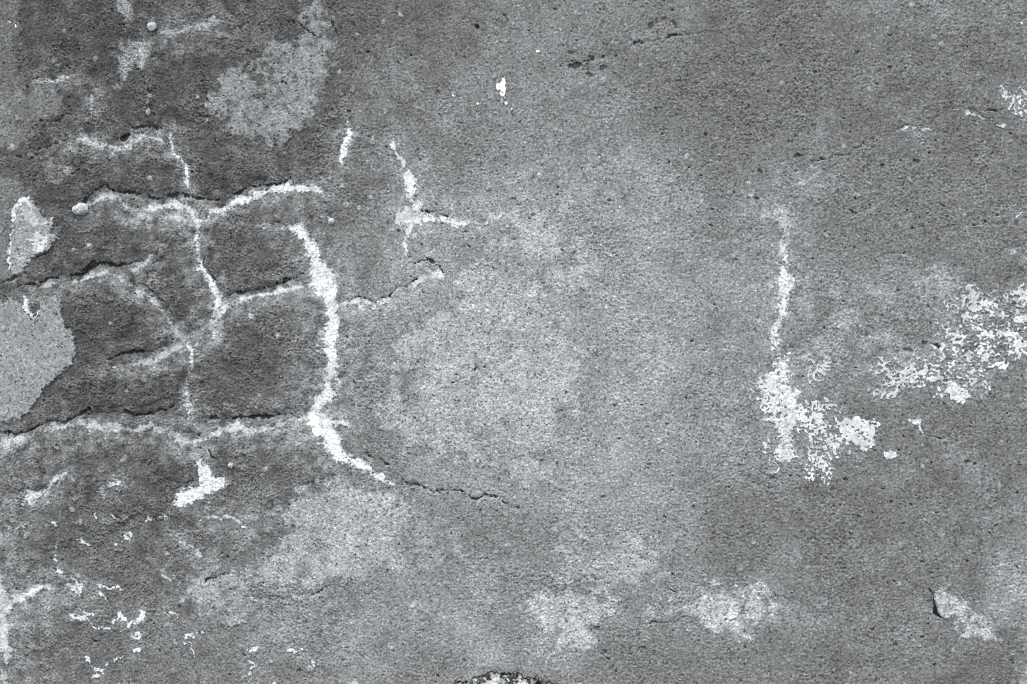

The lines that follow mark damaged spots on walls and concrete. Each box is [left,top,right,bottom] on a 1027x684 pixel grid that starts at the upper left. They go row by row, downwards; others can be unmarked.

flaking render [6,196,59,275]
flaking render [0,295,76,422]
crack [0,74,519,508]
leakage [366,173,607,492]
leakage [746,181,897,485]
leakage [145,449,226,522]
flaking render [454,671,558,684]